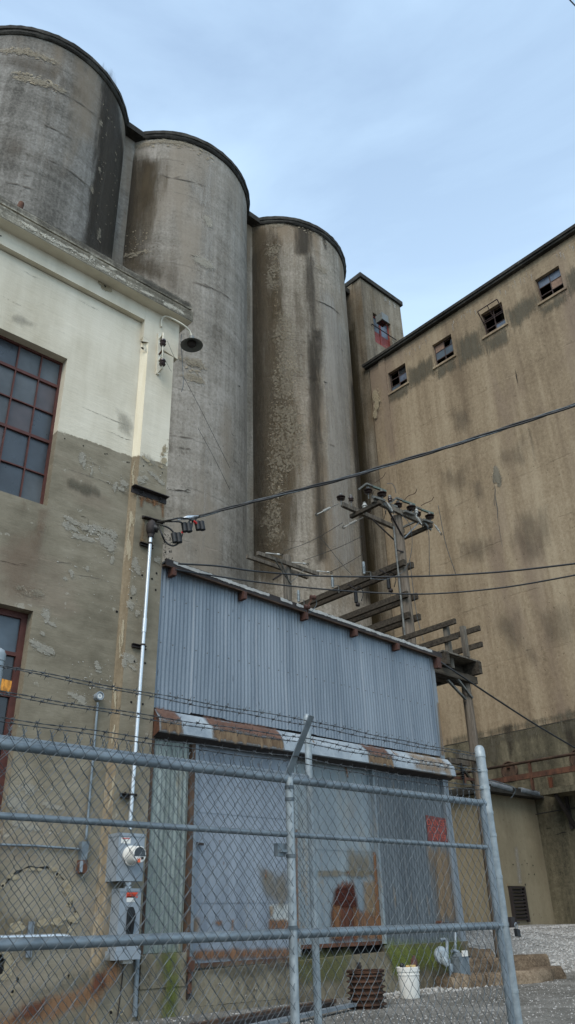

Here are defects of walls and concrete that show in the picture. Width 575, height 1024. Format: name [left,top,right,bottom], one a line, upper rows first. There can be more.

leakage [0,75,189,305]
leakage [390,270,575,399]
peeling [79,445,168,492]
leakage [252,228,295,577]
leakage [308,330,326,560]
peeling [57,512,160,708]
rust [156,707,183,735]
rust [206,717,284,750]
rust [362,744,394,768]